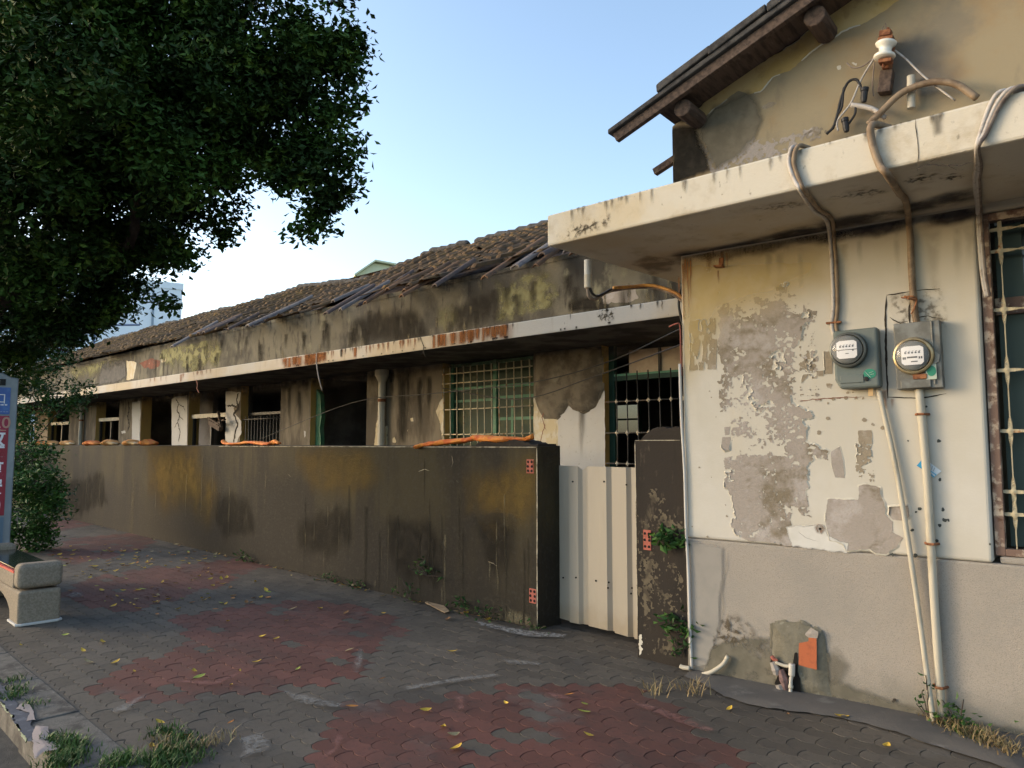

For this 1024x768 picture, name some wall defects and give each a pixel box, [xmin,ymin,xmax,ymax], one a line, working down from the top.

peeling [699,126,827,173]
water stain [99,360,126,386]
rust [283,339,416,367]
water stain [328,288,518,361]
rust [433,324,507,348]
water stain [560,257,676,331]
crack [227,393,239,443]
peeling [689,281,922,557]
peeling [635,440,693,655]
spalling [770,620,833,697]